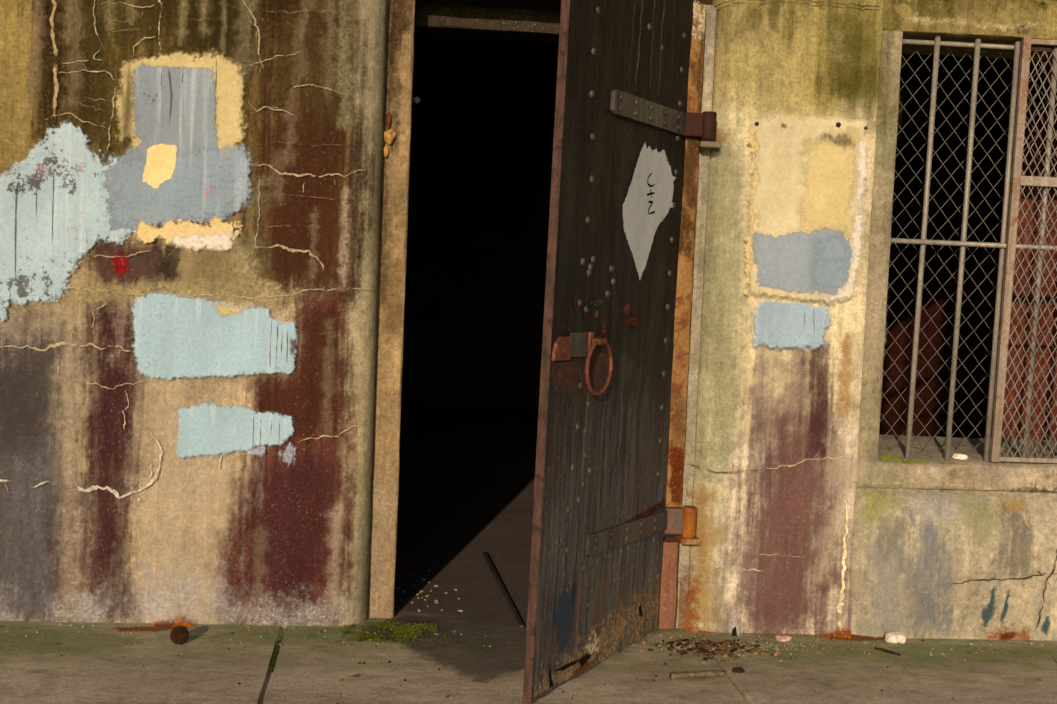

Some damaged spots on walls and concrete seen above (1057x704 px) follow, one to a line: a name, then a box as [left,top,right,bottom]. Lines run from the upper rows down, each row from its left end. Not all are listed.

crack [45,0,182,154]
rust [692,0,706,89]
peeling [5,142,103,198]
crack [178,142,372,299]
peeling [0,266,54,301]
water stain [0,0,371,626]
crack [0,287,164,430]
crack [77,432,163,501]
rust [627,447,684,522]
rust [678,488,715,633]
crack [953,551,1057,630]
rust [988,627,1030,640]